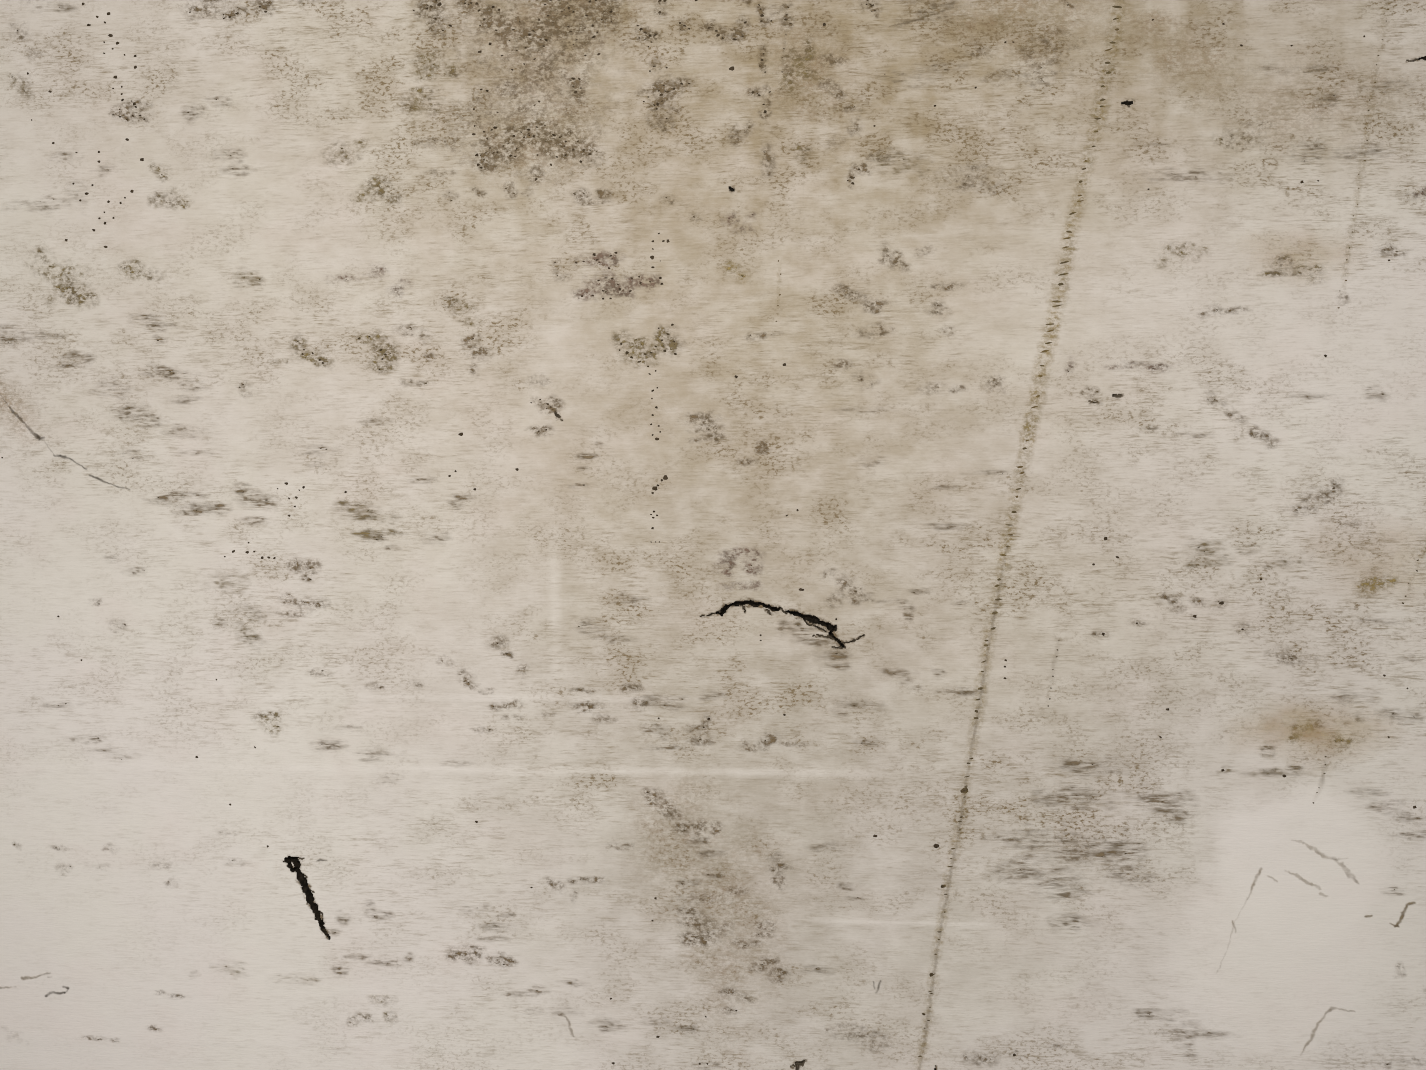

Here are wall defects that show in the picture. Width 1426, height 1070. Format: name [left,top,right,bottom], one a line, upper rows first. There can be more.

leakage [413,0,618,71]
leakage [679,0,792,40]
leakage [410,56,457,111]
leakage [637,25,691,131]
leakage [783,41,840,84]
leakage [472,89,597,181]
leakage [575,252,663,300]
leakage [358,335,397,370]
leakage [614,324,678,367]